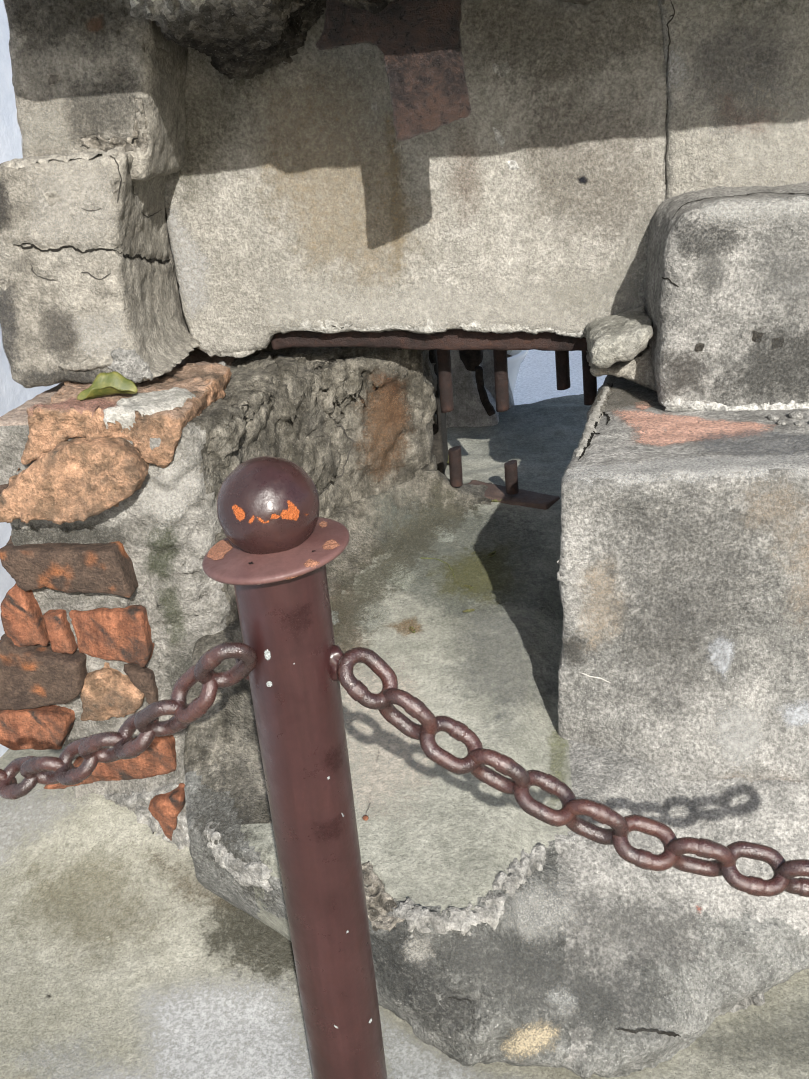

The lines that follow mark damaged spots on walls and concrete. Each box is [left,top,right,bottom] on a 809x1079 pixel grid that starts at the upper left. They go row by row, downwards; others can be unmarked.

spalling [130,0,326,80]
crack [665,0,675,184]
crack [80,112,149,212]
crack [673,192,809,217]
crack [13,208,197,349]
crack [578,383,613,461]
spalling [362,842,546,939]
water stain [504,1025,559,1057]